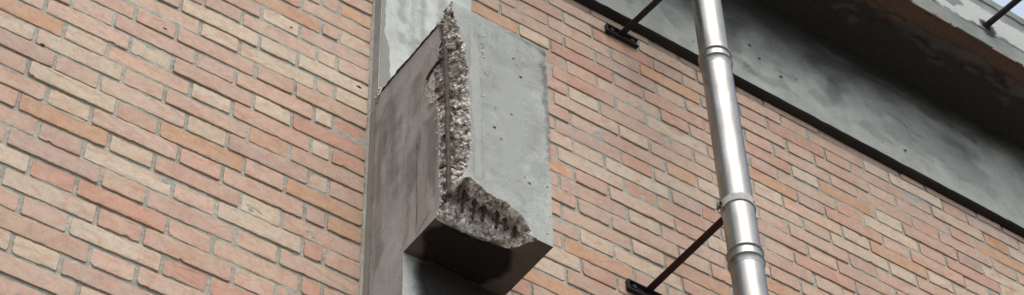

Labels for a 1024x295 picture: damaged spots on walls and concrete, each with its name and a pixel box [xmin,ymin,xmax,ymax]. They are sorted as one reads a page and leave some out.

spalling [374,2,549,248]
damp [757,0,1024,149]